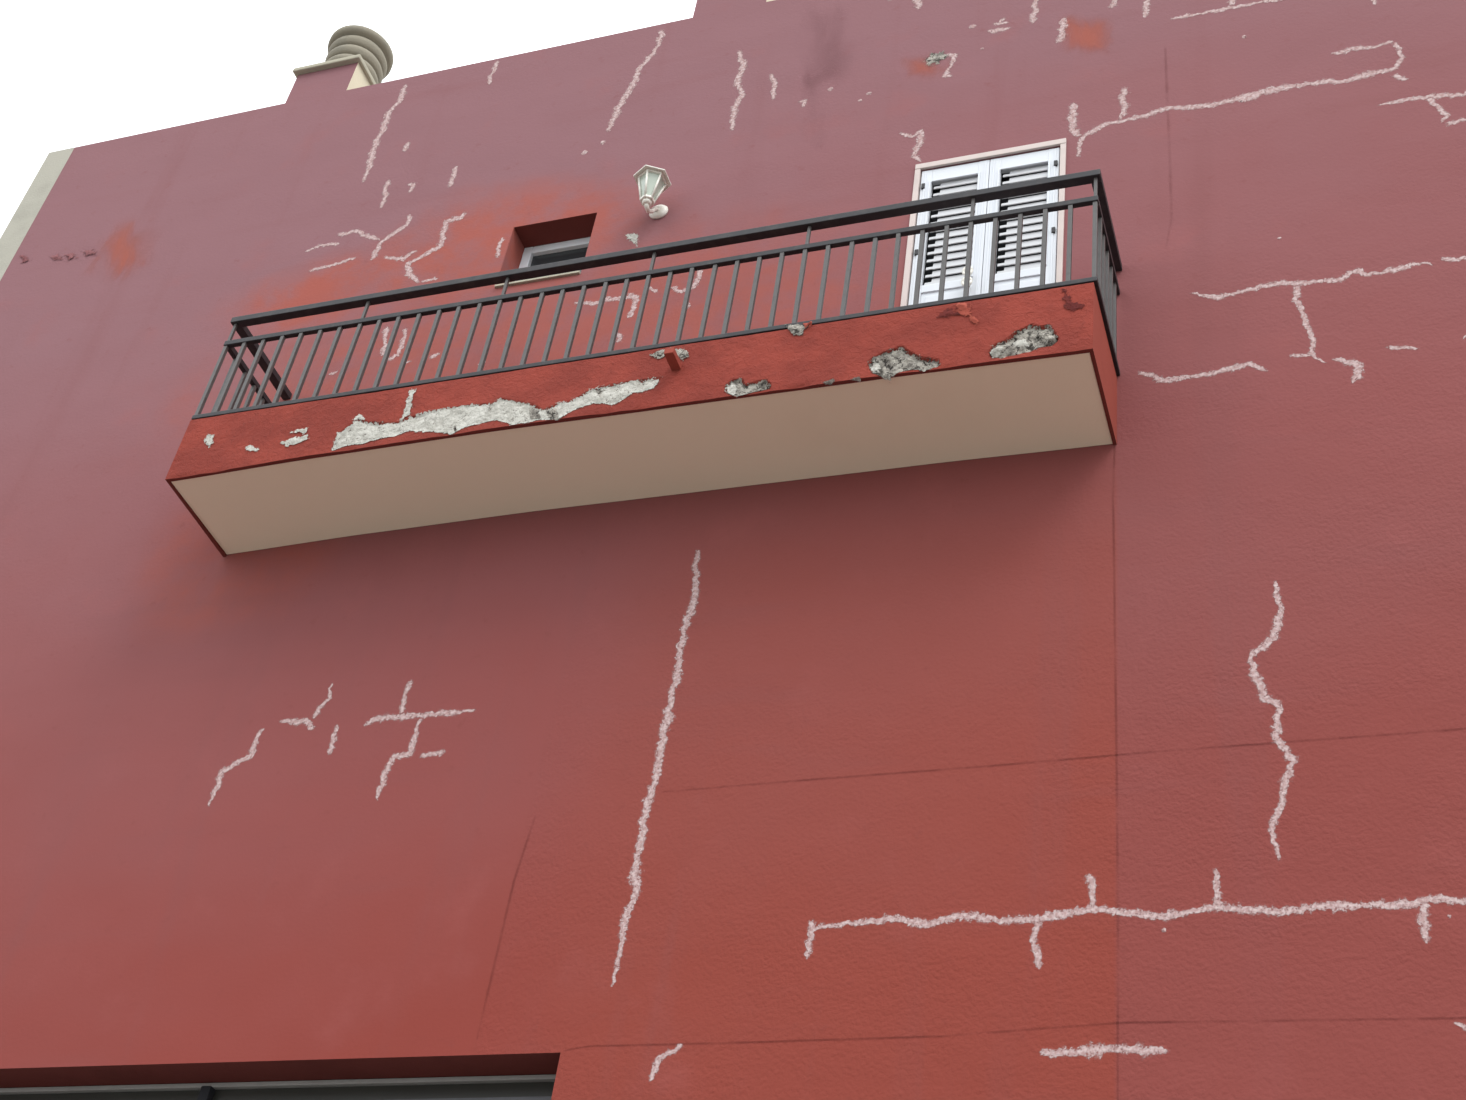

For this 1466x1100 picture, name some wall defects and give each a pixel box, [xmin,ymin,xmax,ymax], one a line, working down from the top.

crack [1067,40,1466,157]
spalling [332,377,659,451]
peeling [650,348,689,361]
spalling [724,377,771,396]
spalling [822,347,941,385]
spalling [989,323,1058,359]
crack [1138,256,1466,383]
crack [208,681,475,806]
crack [612,550,700,985]
crack [1248,582,1298,860]
crack [804,869,1466,969]
crack [1040,1042,1167,1059]